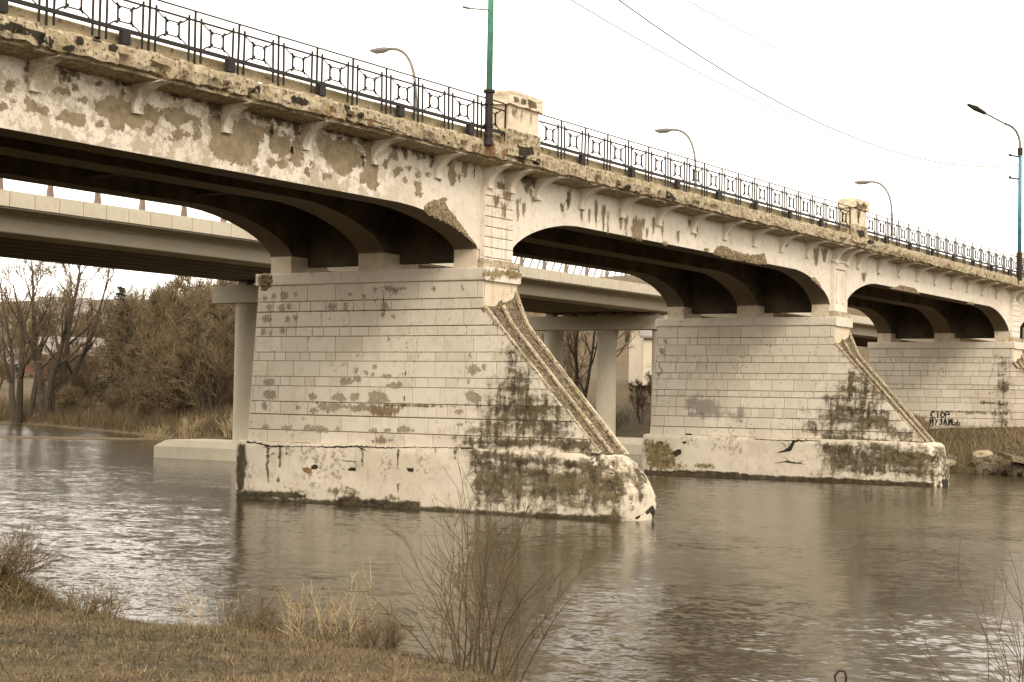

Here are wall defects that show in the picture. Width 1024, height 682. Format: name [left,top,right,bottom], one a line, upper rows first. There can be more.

peeling [0,74,474,244]
spalling [704,245,767,265]
peeling [261,364,402,433]
damp [371,405,403,417]
peeling [369,425,414,433]
damp [476,356,569,426]
damp [838,371,888,414]
crack [247,441,474,464]
crack [756,439,820,464]
damp [636,435,947,501]